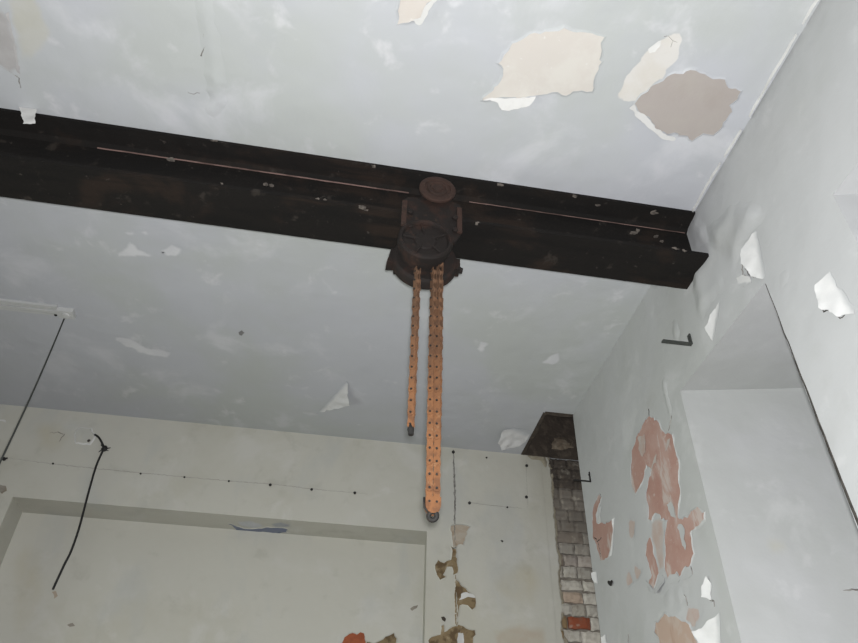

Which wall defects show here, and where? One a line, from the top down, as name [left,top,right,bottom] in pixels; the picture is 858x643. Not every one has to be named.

peeling [395,0,437,25]
peeling [480,24,606,111]
peeling [614,33,743,142]
peeling [737,231,765,287]
peeling [814,271,855,319]
peeling [317,382,349,414]
peeling [498,428,531,450]
peeling [626,409,706,593]
flaking render [528,455,615,643]
flaking render [427,524,477,643]
peeling [654,577,721,643]